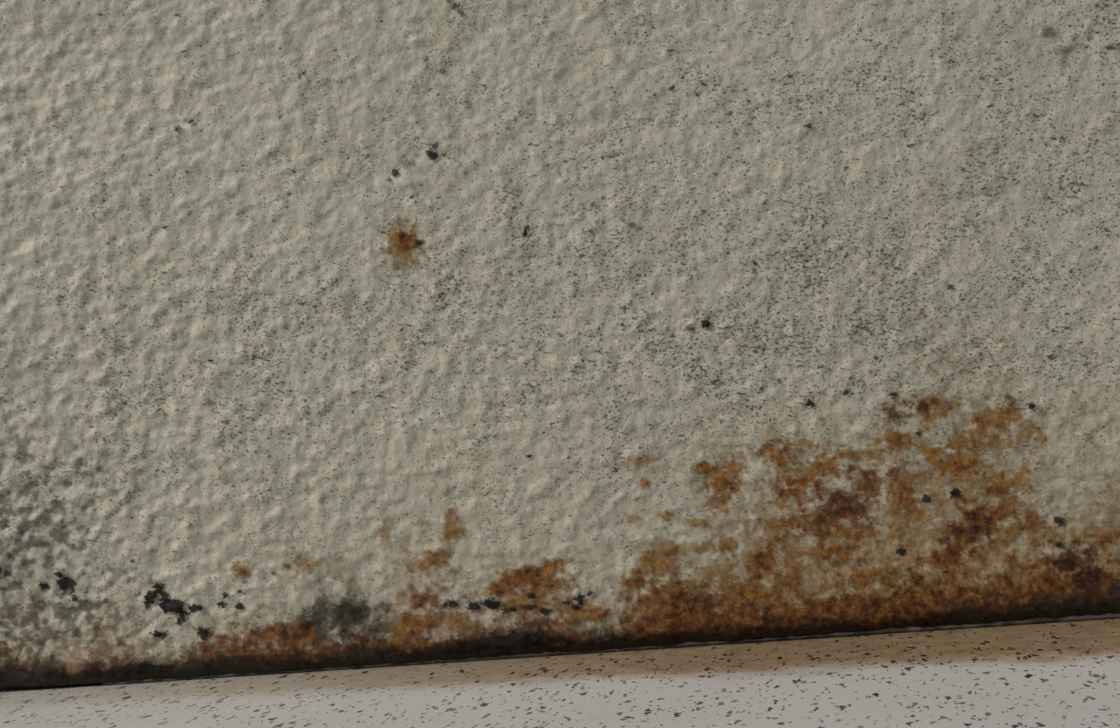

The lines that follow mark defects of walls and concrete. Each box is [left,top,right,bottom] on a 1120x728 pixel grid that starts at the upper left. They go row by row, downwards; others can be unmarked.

rust [386,224,423,267]
rust [168,396,1120,667]